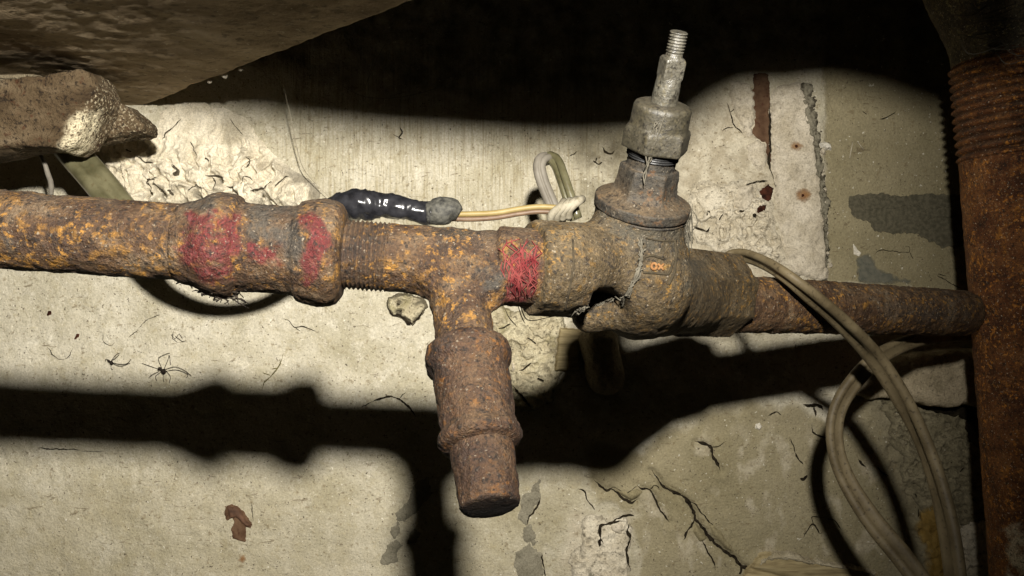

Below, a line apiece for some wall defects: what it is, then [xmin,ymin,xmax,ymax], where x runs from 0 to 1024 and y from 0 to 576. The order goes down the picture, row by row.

leakage [849,193,964,248]
crack [362,393,416,416]
crack [695,441,724,469]
crack [768,403,826,481]
peeling [514,479,544,576]
crack [580,473,747,574]